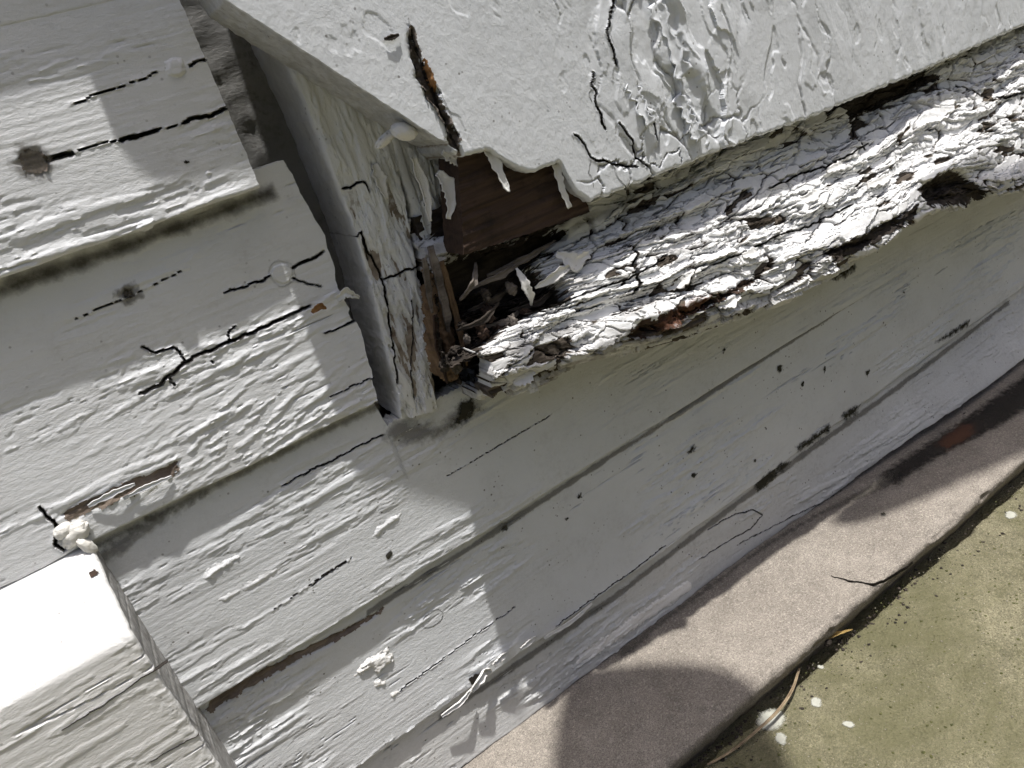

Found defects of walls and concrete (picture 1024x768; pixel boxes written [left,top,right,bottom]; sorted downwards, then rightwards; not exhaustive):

crack [574,0,658,187]
crack [48,108,228,160]
peeling [826,161,846,174]
peeling [410,151,591,375]
peeling [822,203,919,263]
crack [140,251,323,394]
crack [356,231,418,398]
peeling [626,275,763,340]
peeling [64,461,180,522]
crack [282,435,383,486]
crack [832,561,913,586]
peeling [205,607,384,714]